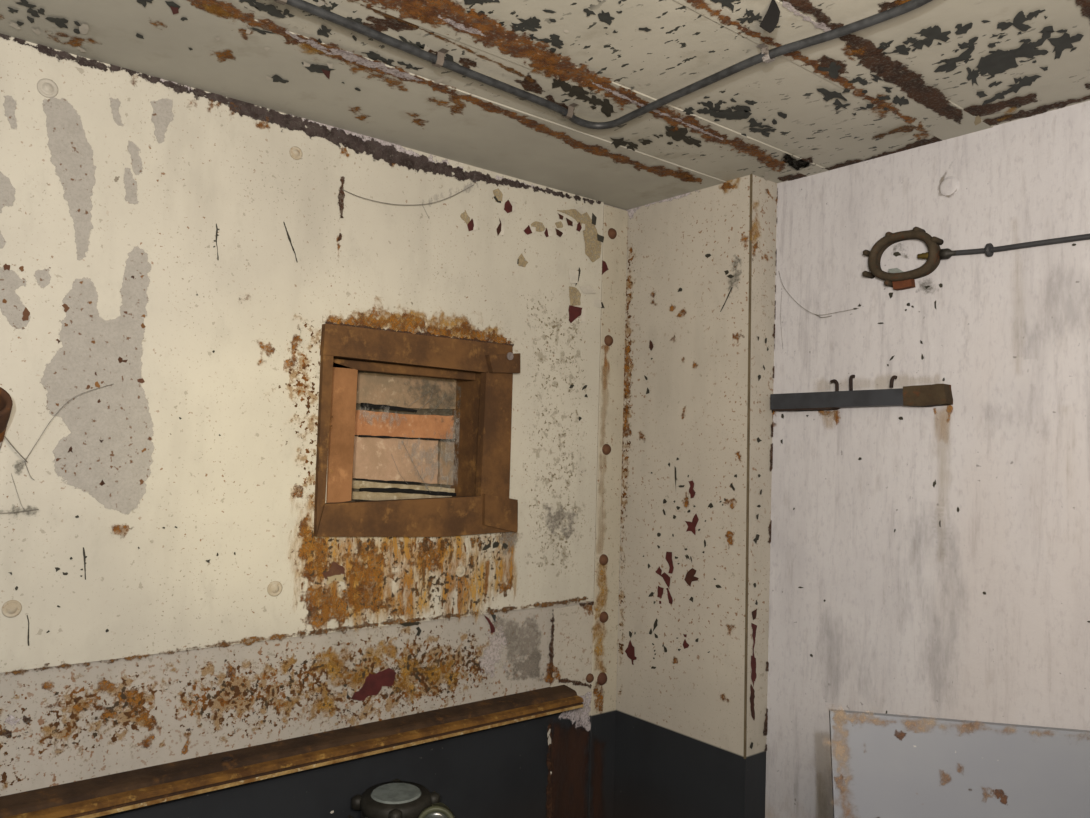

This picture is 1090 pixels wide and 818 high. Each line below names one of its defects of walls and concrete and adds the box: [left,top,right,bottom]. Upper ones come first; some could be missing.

peeling [43,97,96,260]
peeling [510,10,569,54]
peeling [552,77,617,117]
peeling [683,96,787,137]
peeling [817,62,909,116]
peeling [878,9,1084,105]
peeling [0,264,51,329]
peeling [40,246,154,514]
peeling [521,206,609,573]
rust [621,243,645,568]
rust [0,307,625,795]
peeling [643,458,737,604]